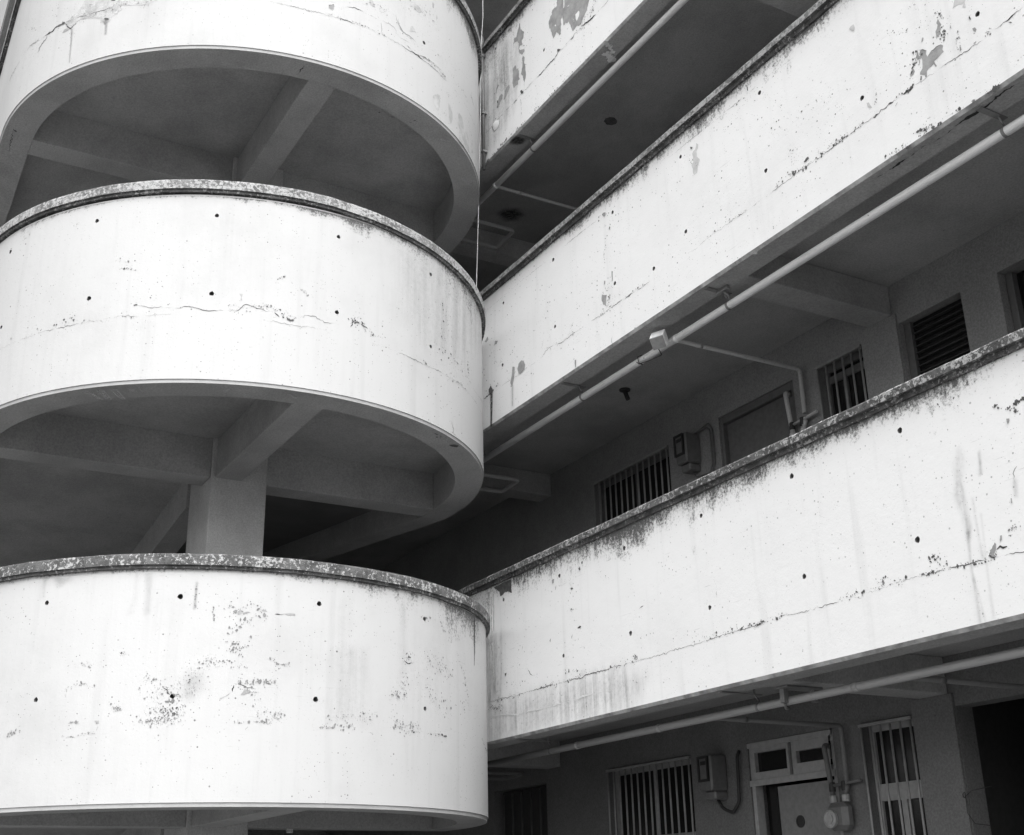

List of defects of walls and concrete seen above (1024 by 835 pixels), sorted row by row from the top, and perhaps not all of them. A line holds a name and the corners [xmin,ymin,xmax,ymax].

peeling [549,0,589,38]
crack [773,9,1021,191]
peeling [910,12,961,80]
crack [23,304,328,339]
damp [431,370,976,665]
crack [488,552,1023,713]